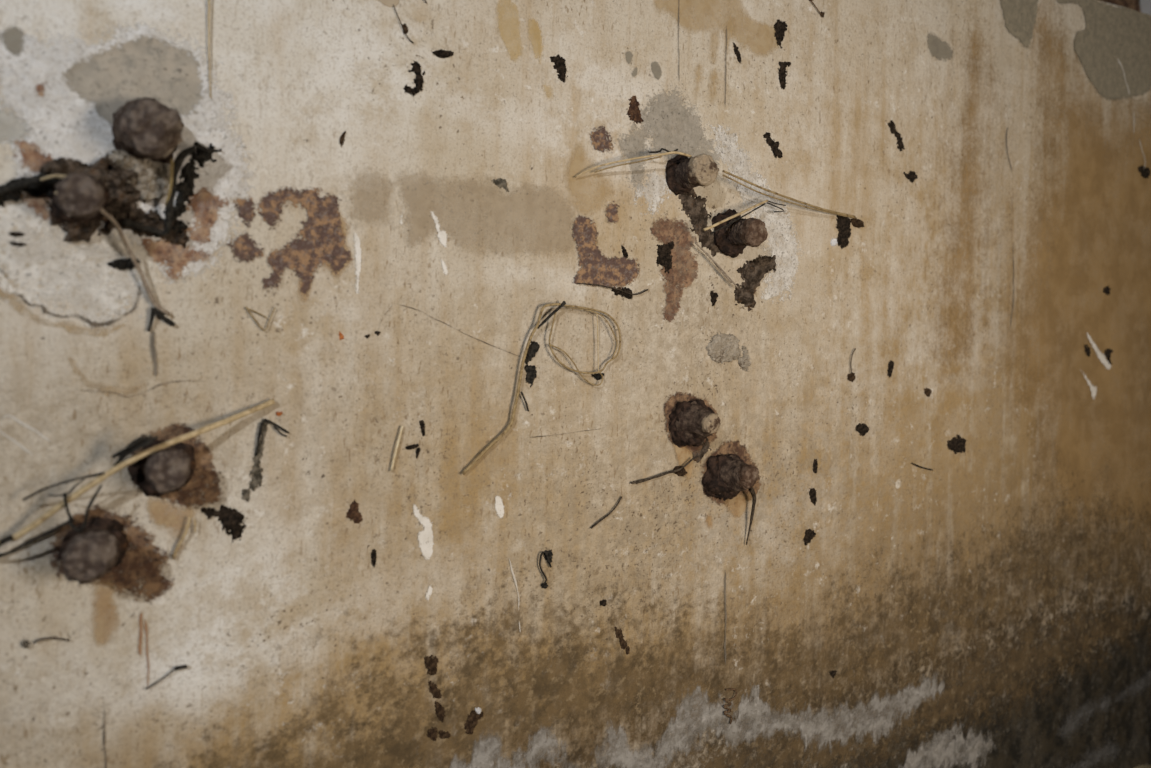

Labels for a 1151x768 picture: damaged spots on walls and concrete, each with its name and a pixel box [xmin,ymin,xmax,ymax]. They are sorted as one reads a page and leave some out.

spalling [61,33,206,125]
damp [498,0,542,59]
damp [656,0,777,105]
peeling [1000,0,1039,48]
peeling [1057,0,1151,101]
rust [590,126,614,153]
spalling [0,198,156,339]
rust [141,183,353,294]
rust [572,201,641,290]
rust [651,215,698,323]
damp [248,17,1151,768]